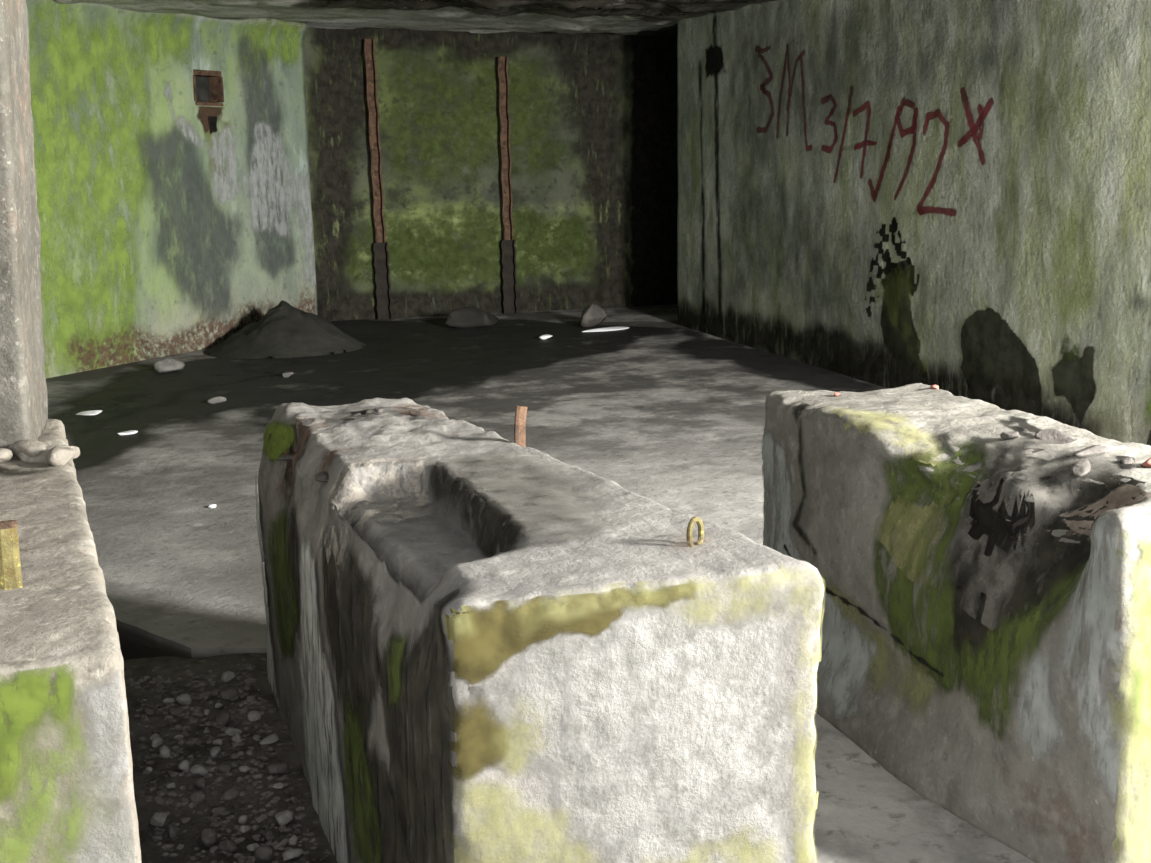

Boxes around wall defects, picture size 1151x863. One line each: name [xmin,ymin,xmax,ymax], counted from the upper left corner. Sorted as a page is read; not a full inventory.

corrosion [197,106,222,134]
leakage [50,15,1099,470]
crack [783,403,816,557]
crack [824,587,944,677]
leakage [59,674,137,863]